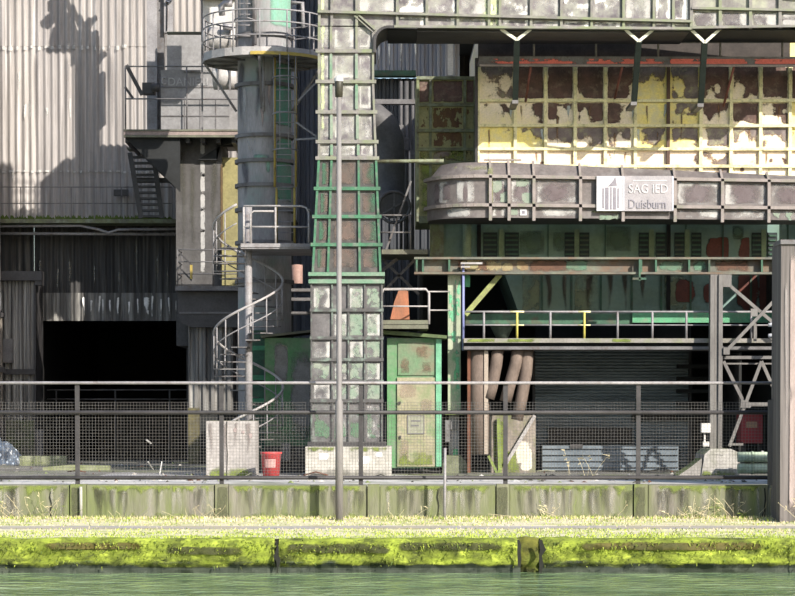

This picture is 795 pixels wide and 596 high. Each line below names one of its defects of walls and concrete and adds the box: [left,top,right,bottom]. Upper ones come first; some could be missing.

peeling [481,59,795,173]
peeling [493,180,518,215]
peeling [516,179,532,203]
rust [716,260,748,271]
rust [458,260,567,305]
damp [71,488,79,517]
damp [217,487,227,518]
damp [0,544,521,573]
damp [400,542,502,550]